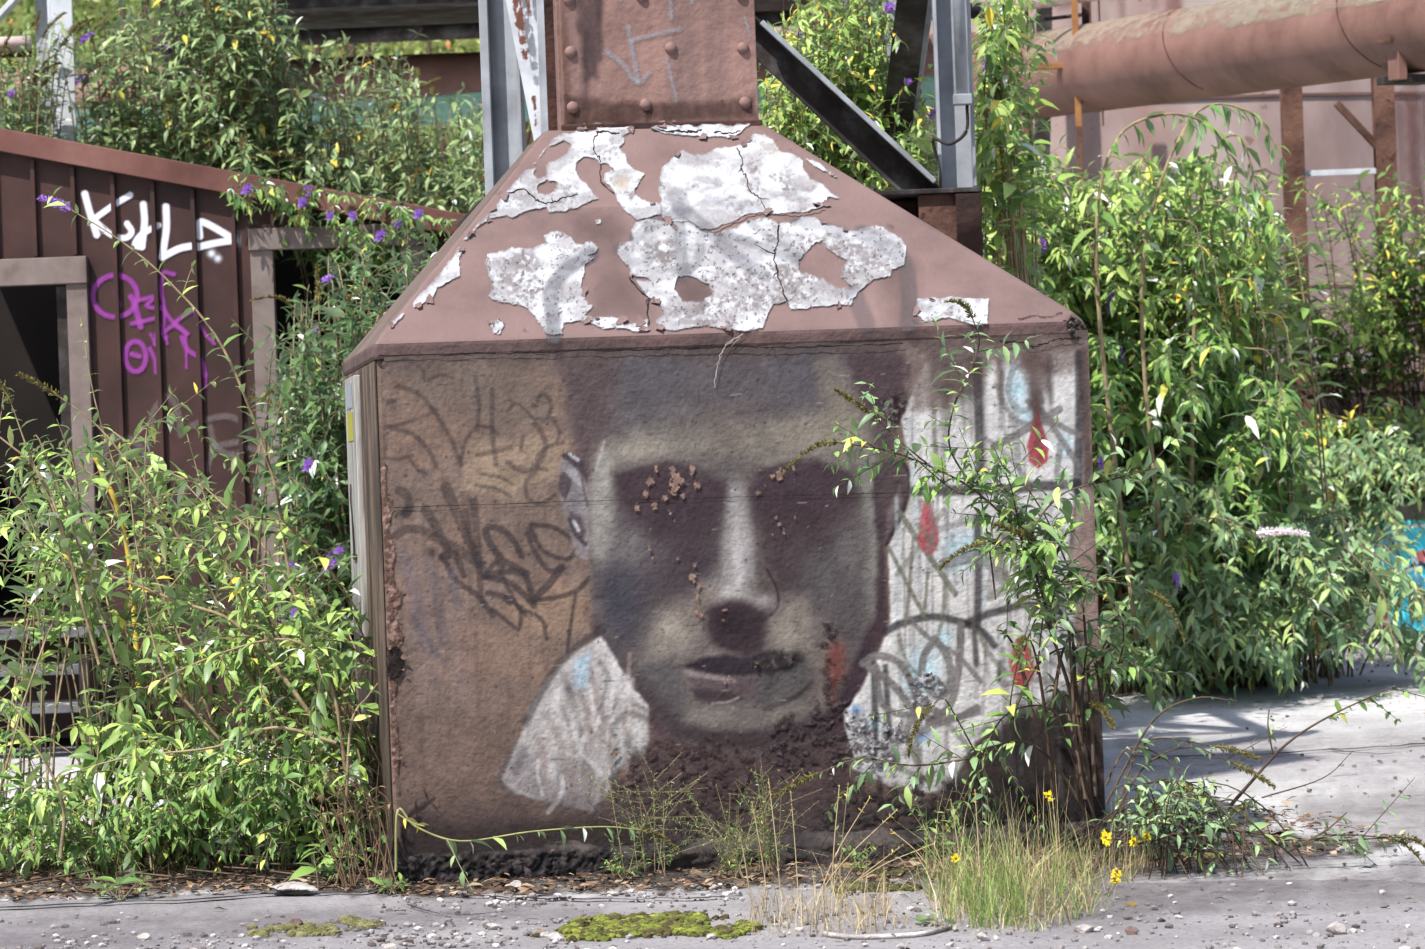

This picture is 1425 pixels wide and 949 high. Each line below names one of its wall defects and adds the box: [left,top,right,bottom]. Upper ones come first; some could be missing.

rust [577,0,600,77]
rust [566,97,753,124]
peeling [389,119,906,335]
peeling [913,296,989,325]